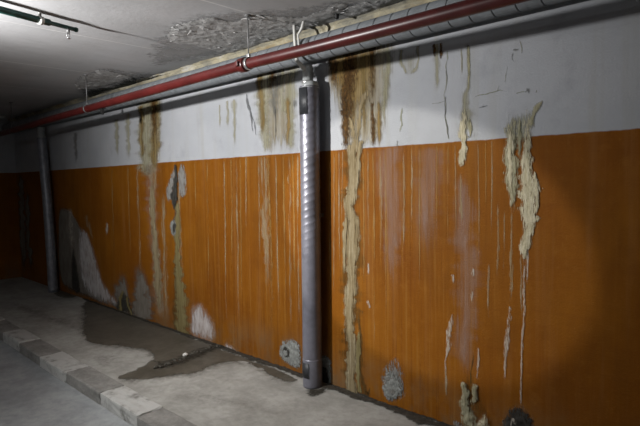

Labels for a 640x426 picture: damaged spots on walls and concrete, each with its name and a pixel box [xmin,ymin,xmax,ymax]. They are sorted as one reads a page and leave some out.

flaking render [155,0,396,65]
damp [138,98,161,174]
damp [256,66,295,149]
crack [432,52,449,139]
damp [458,46,472,167]
spalling [166,164,186,209]
peeling [58,208,154,320]
damp [83,185,302,382]
damp [307,132,371,398]
damp [502,101,543,401]
spalling [279,340,301,369]
spalling [382,359,404,401]